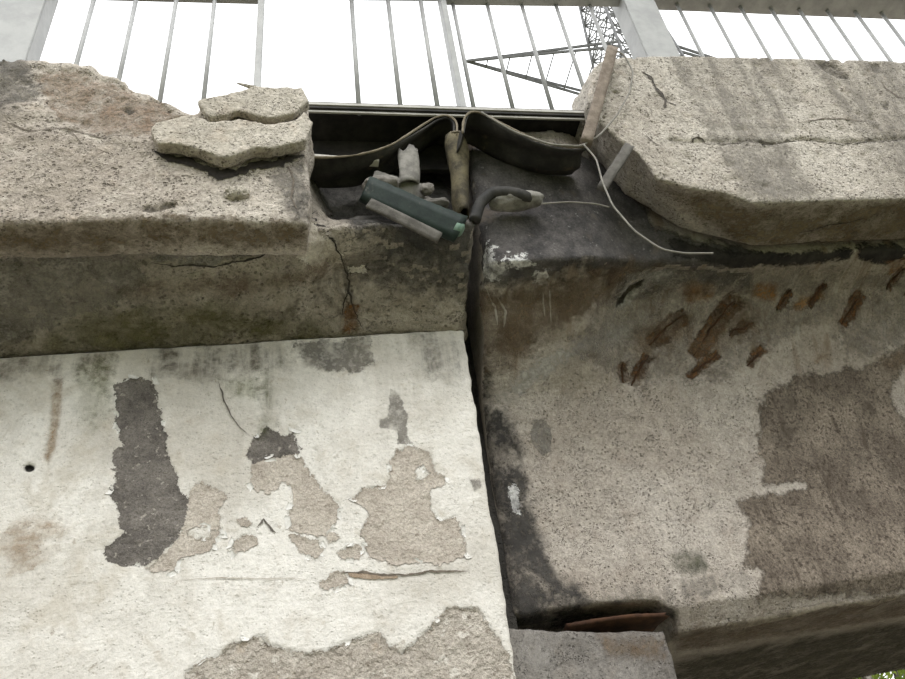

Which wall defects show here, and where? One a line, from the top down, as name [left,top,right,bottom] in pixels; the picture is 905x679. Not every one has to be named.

peeling [38,72,313,168]
crack [647,118,901,145]
crack [154,150,363,328]
peeling [245,396,472,593]
damp [482,368,603,630]
damp [671,347,905,652]
peeling [184,604,515,679]